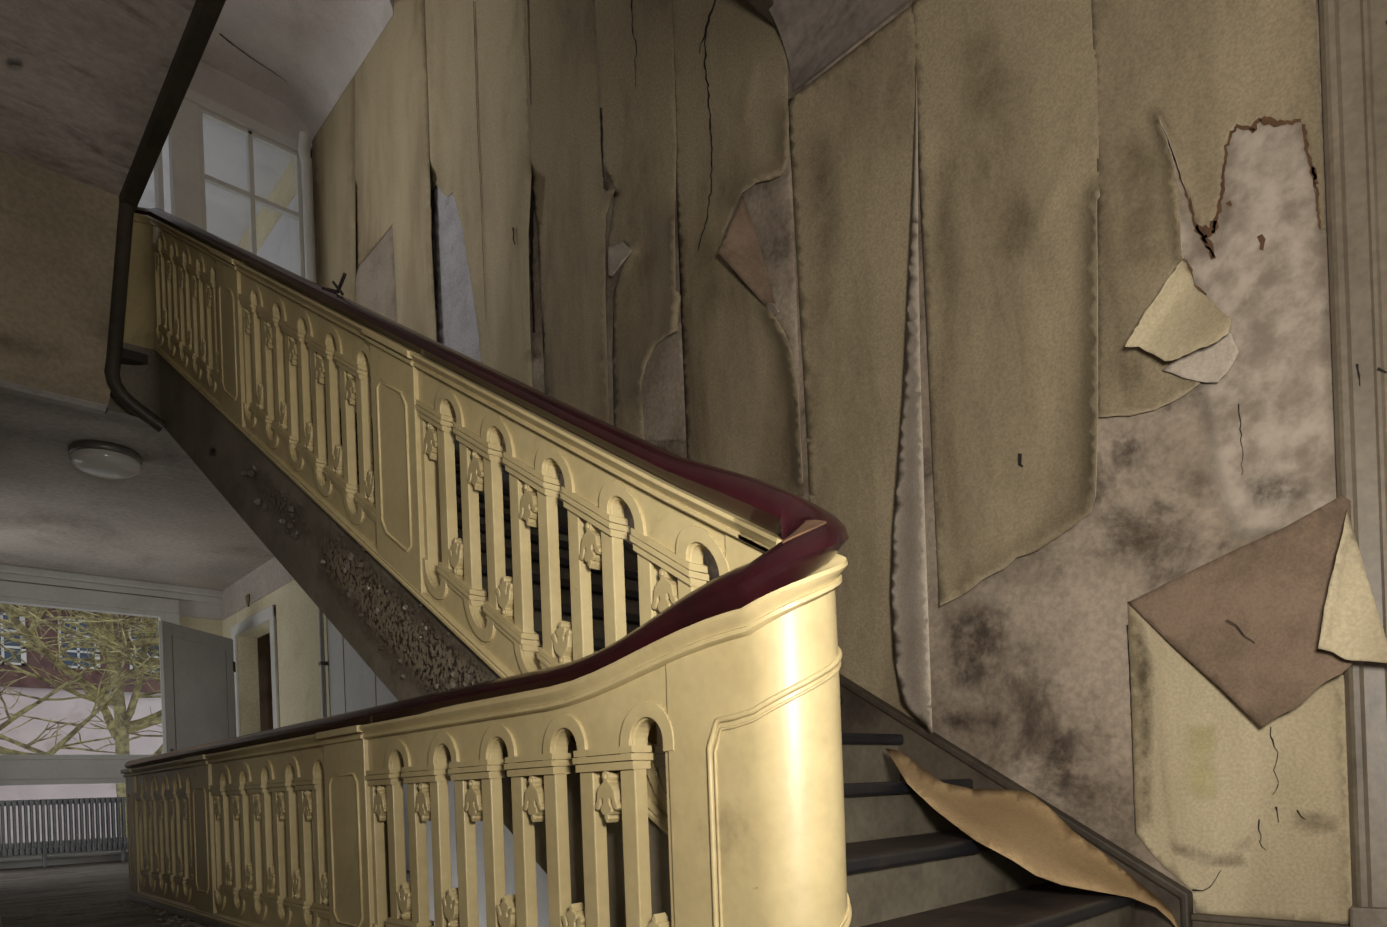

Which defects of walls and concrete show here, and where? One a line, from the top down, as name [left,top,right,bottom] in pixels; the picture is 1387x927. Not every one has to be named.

flaking render [432,185,481,362]
flaking render [641,323,686,442]
flaking render [720,152,802,441]
flaking render [1180,116,1335,532]
crack [1258,727,1305,850]